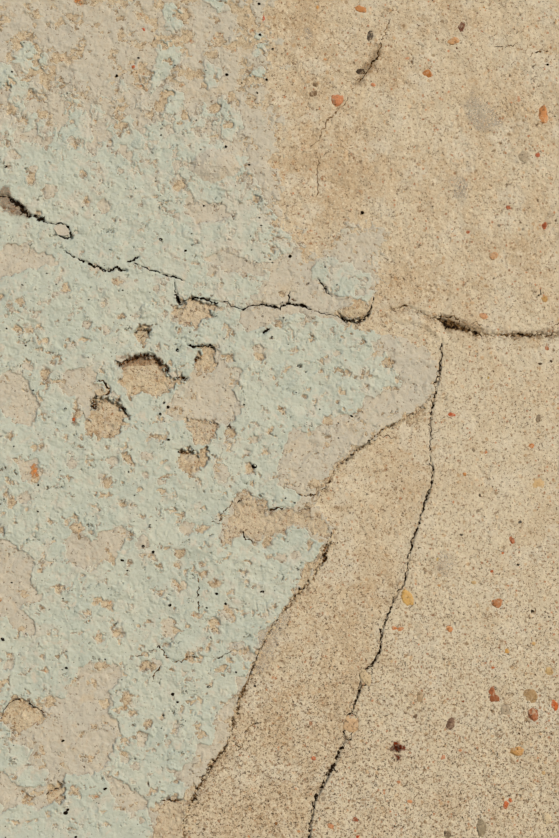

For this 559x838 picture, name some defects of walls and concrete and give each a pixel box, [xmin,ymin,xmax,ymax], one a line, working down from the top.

peeling [0,241,59,279]
spalling [170,296,218,331]
peeling [0,369,42,427]
peeling [58,324,244,478]
peeling [221,220,439,594]
peeling [0,539,43,637]
peeling [63,526,131,572]
crack [0,196,559,838]
peeling [0,662,195,838]